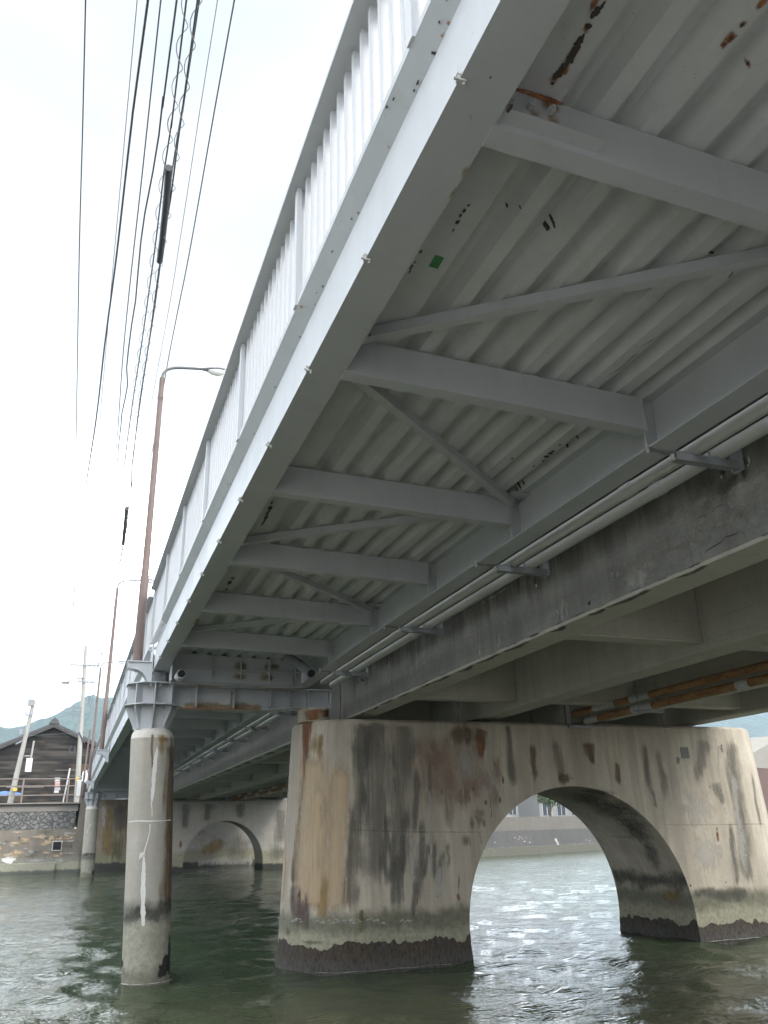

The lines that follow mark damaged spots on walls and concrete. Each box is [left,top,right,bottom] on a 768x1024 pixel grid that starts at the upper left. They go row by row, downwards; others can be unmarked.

rust [516,0,606,123]
rust [721,22,746,48]
water stain [590,456,766,615]
water stain [124,746,287,926]
rust [302,710,328,775]
water stain [281,620,527,924]
rust [451,725,485,756]
water stain [584,743,594,763]
water stain [579,747,751,900]